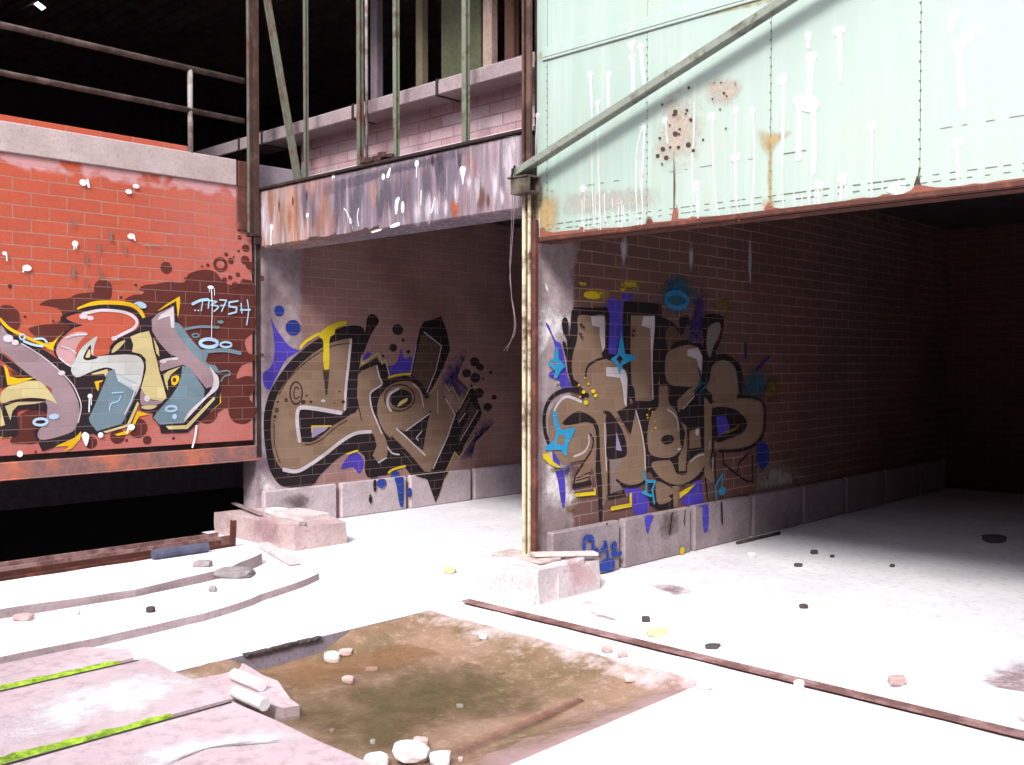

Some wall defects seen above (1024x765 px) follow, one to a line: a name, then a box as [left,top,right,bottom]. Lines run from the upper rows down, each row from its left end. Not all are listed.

rust [478,188,490,210]
rust [764,134,781,203]